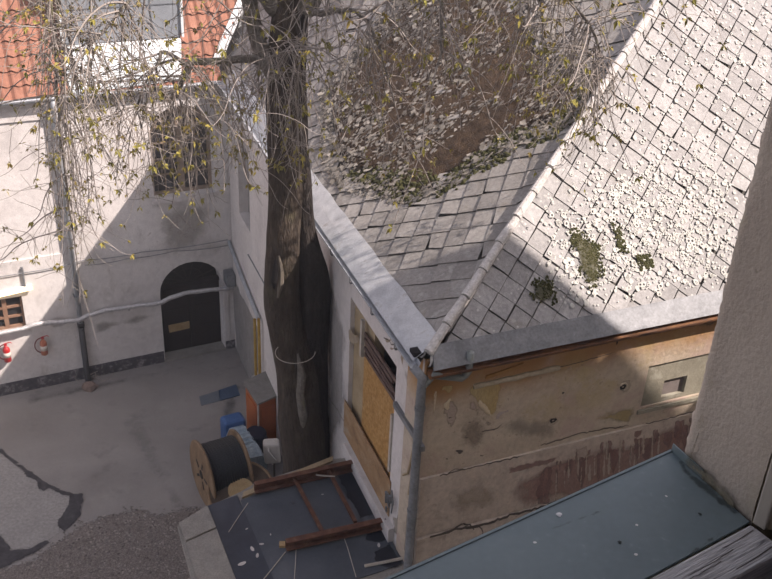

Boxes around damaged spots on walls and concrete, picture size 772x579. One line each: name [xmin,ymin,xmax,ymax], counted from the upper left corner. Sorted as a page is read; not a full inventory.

crack [541,411,694,446]
crack [440,456,520,476]
damp [510,418,733,507]
crack [430,501,555,538]